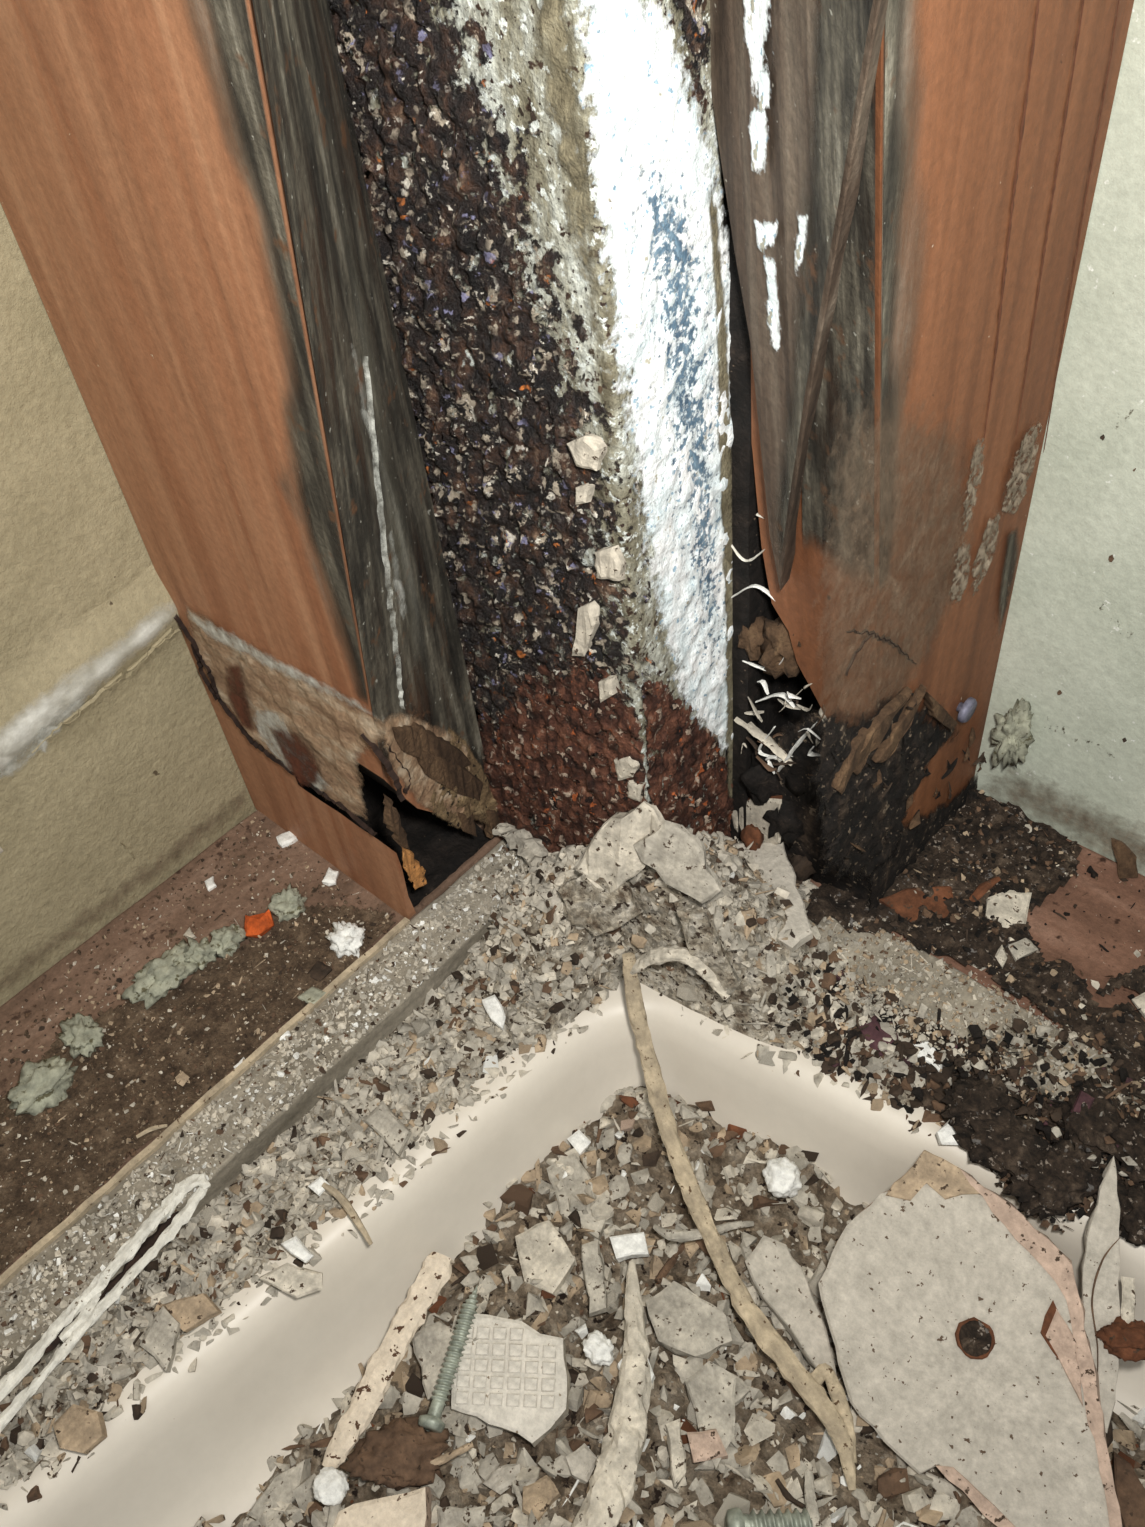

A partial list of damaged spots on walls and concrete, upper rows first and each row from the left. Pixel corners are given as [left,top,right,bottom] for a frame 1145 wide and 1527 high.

leakage [536,0,597,330]
leakage [743,0,771,171]
leakage [193,0,483,770]
leakage [754,0,1042,912]
crack [845,628,916,676]
spalling [273,730,318,786]
peeling [402,847,427,890]